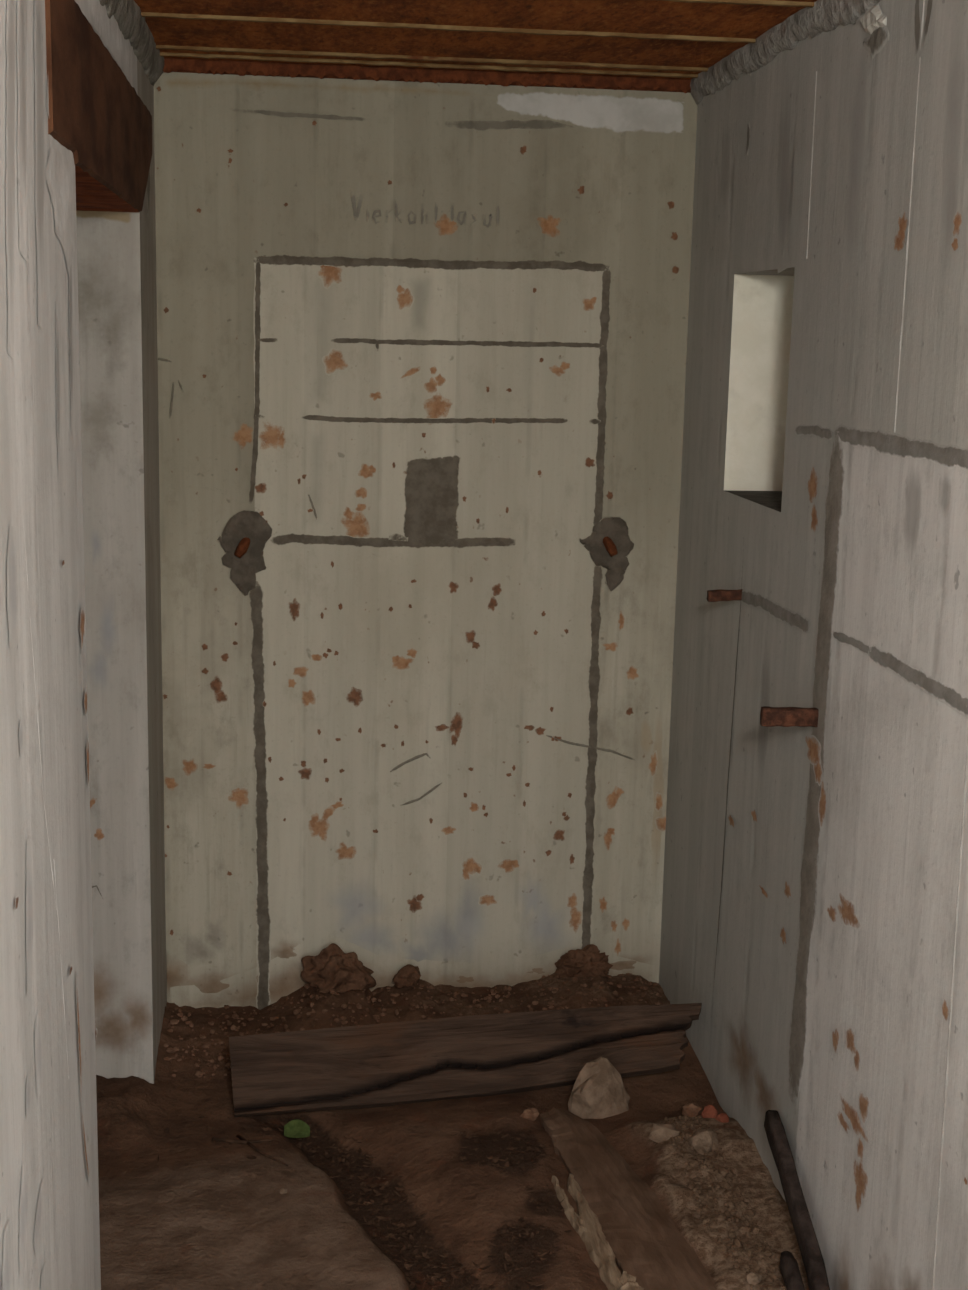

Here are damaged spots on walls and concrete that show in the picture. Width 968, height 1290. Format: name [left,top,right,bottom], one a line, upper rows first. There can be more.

rust [399,365,454,438]
rust [340,461,396,537]
spalling [216,510,273,599]
spalling [579,517,634,592]
rust [201,622,238,704]
rust [345,685,364,709]
rust [425,709,464,747]
rust [278,758,345,783]
rust [306,797,358,861]
rust [406,893,425,914]
rust [826,891,862,930]
rust [837,1091,871,1215]